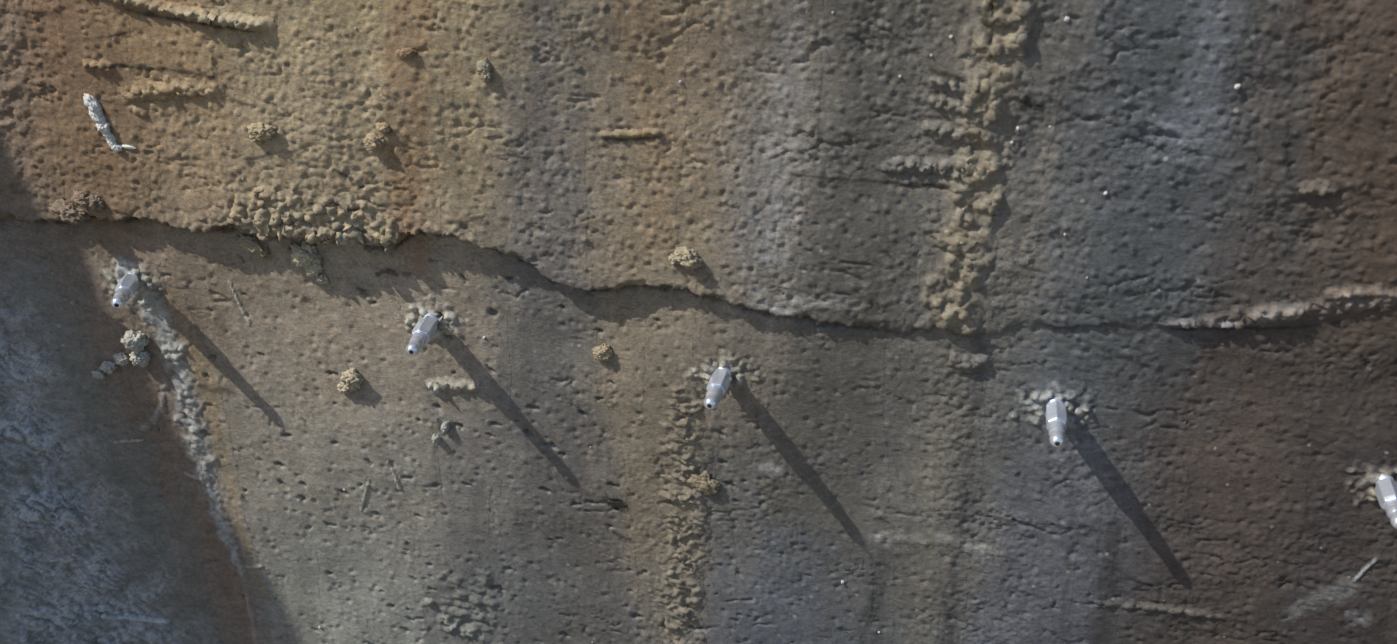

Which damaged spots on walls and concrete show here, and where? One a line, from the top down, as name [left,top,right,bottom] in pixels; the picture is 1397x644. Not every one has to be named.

crack [239,149,272,163]
crack [490,152,533,162]
leakage [389,0,662,644]
crack [4,167,1397,362]
leakage [698,0,1330,644]
leakage [0,251,260,644]
leakage [287,529,374,644]